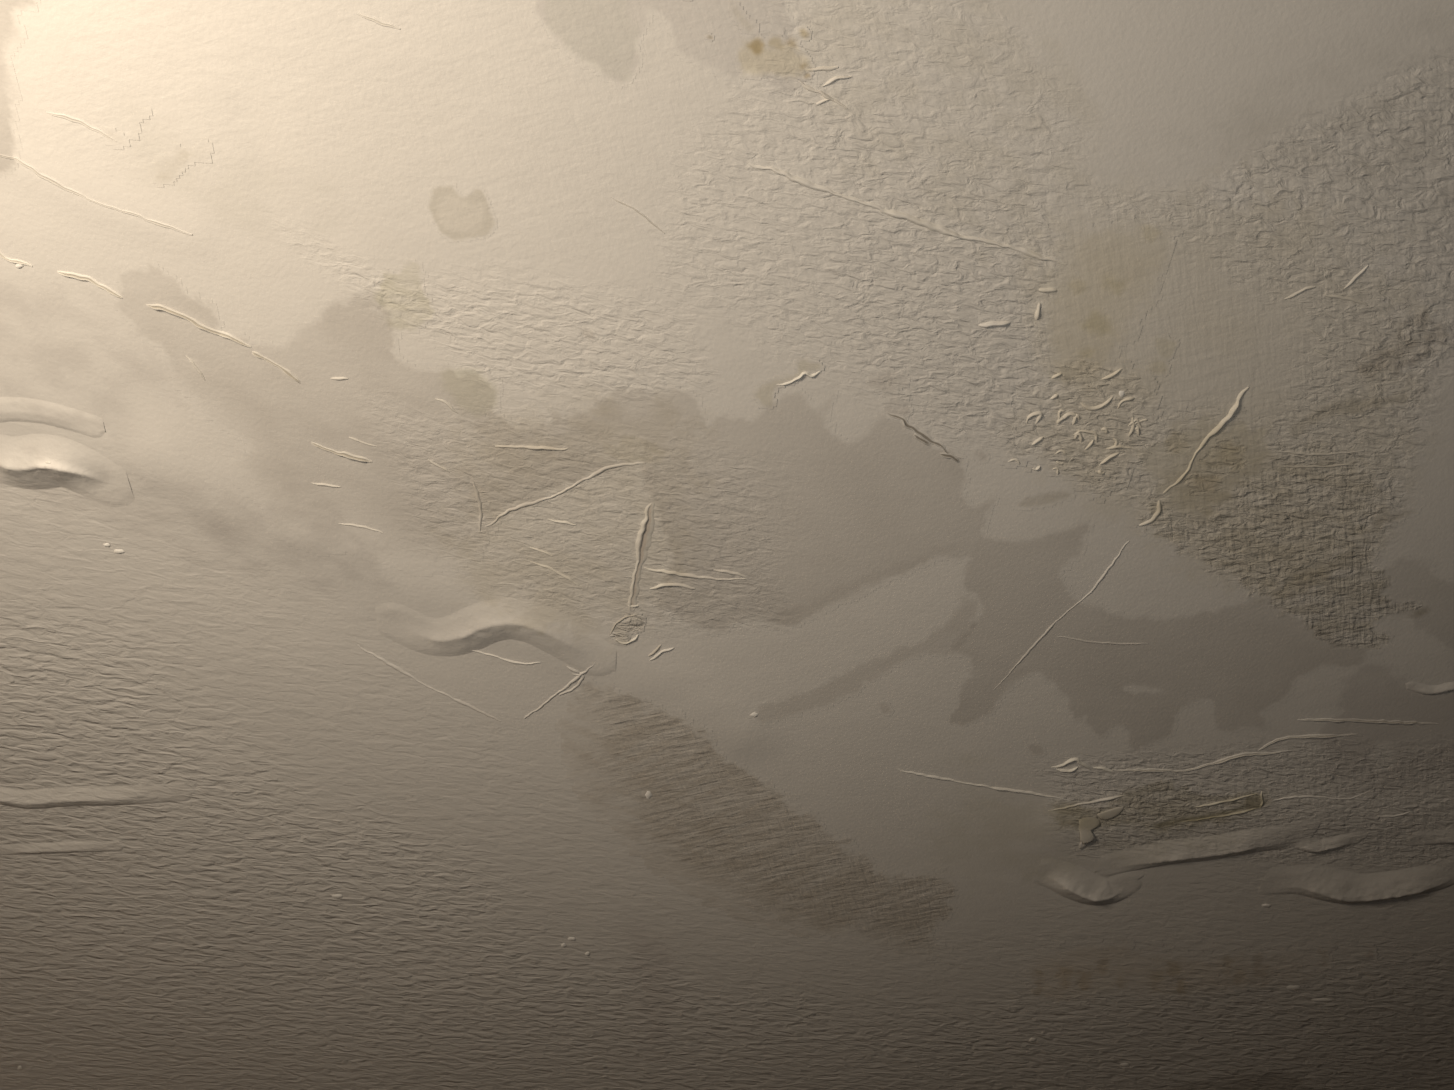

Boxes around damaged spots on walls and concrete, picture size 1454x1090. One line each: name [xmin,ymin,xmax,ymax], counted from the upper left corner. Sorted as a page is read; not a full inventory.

water stain [0,0,41,178]
crack [886,412,963,462]
water stain [113,259,1454,810]